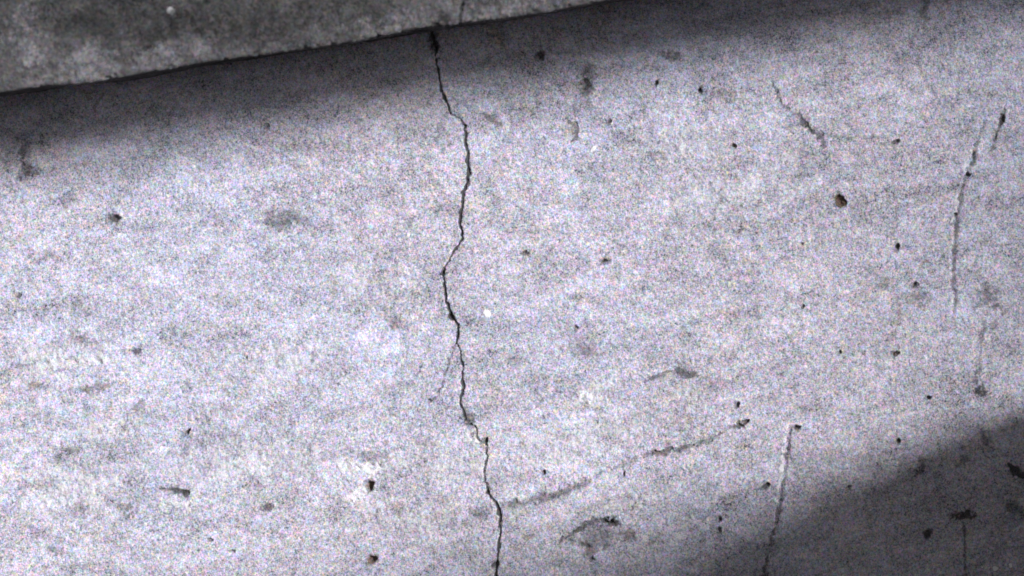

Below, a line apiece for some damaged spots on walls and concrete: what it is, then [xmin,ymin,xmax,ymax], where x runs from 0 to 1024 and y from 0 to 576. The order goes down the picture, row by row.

crack [428,0,502,576]